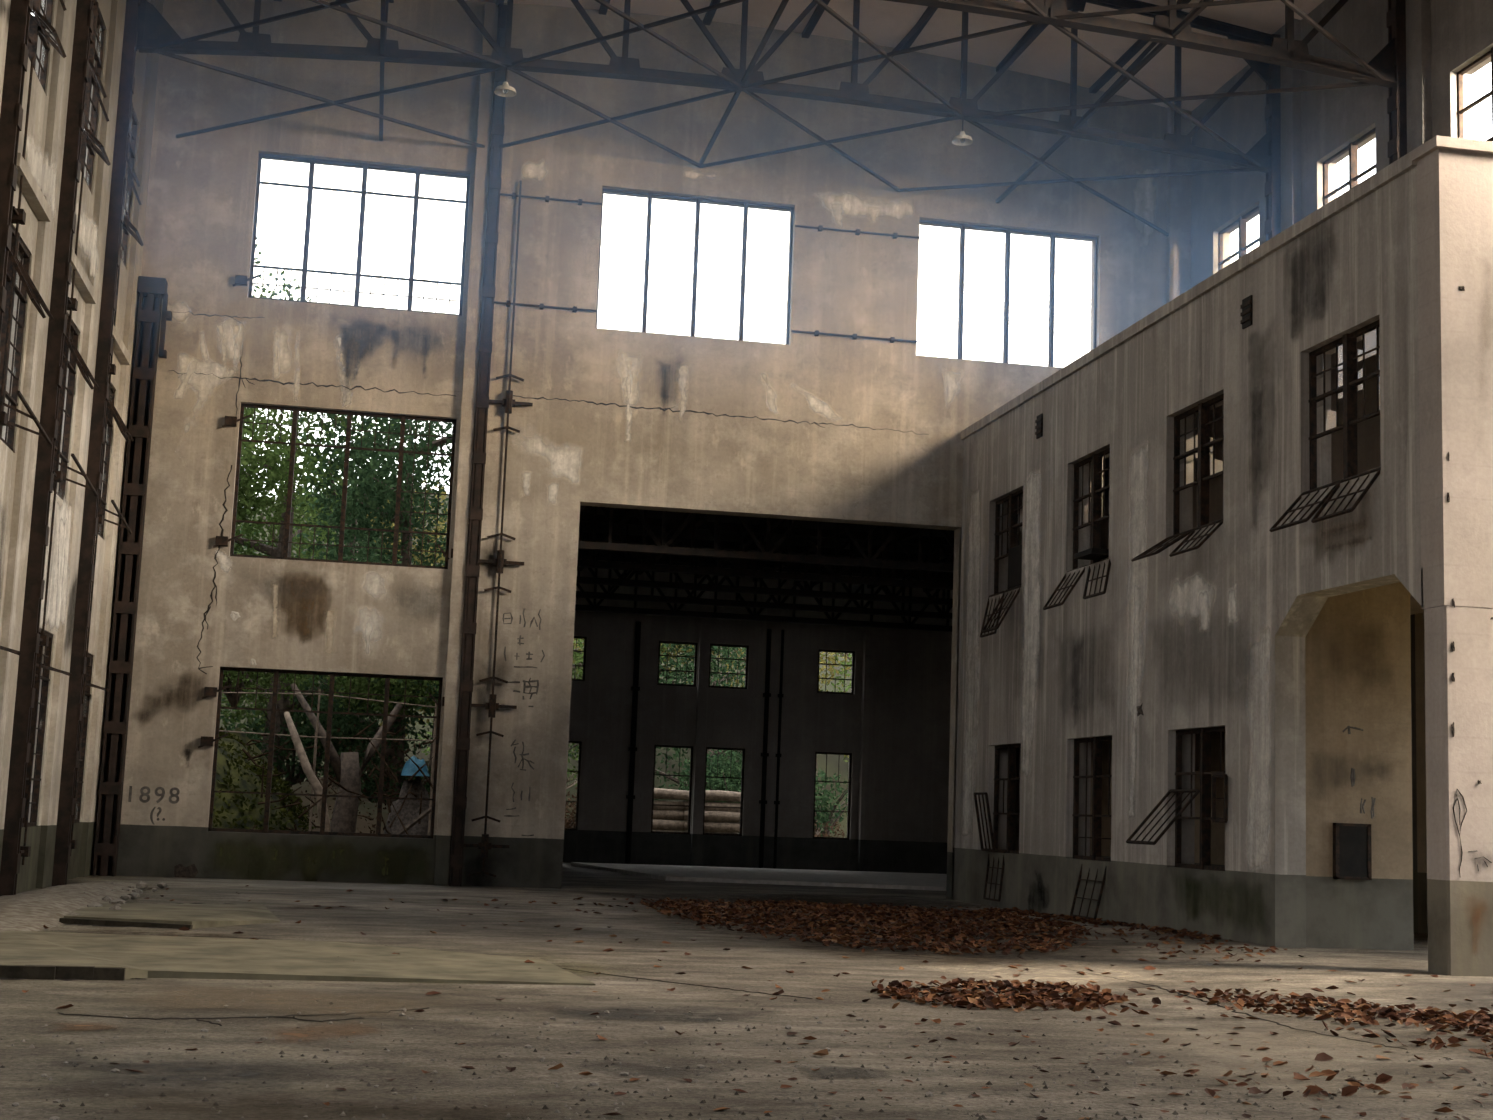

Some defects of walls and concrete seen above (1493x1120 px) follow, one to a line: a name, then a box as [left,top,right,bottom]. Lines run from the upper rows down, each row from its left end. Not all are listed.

leakage [338,320,440,405]
crack [196,465,233,674]
leakage [326,611,334,653]